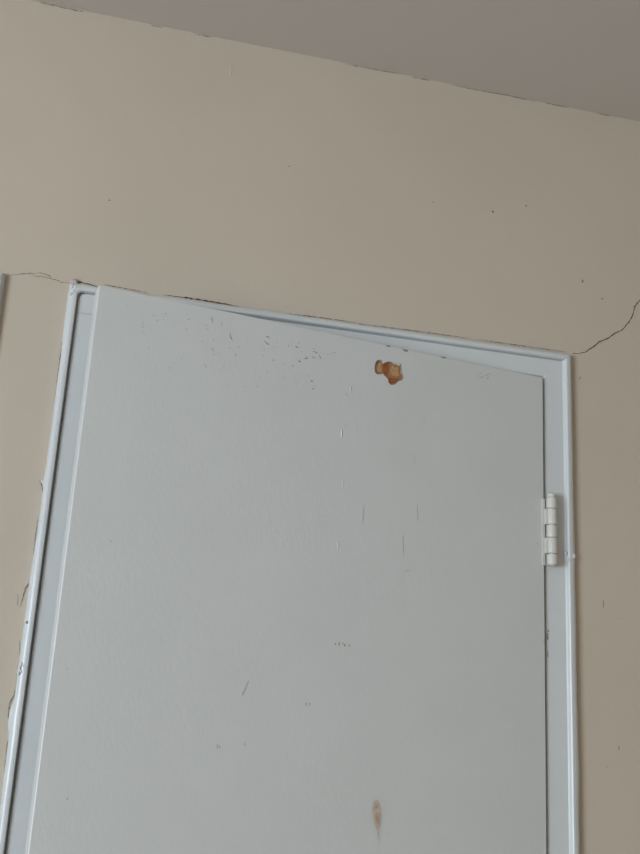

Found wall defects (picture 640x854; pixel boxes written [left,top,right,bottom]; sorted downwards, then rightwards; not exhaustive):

crack [15,273,238,307]
crack [294,300,640,354]